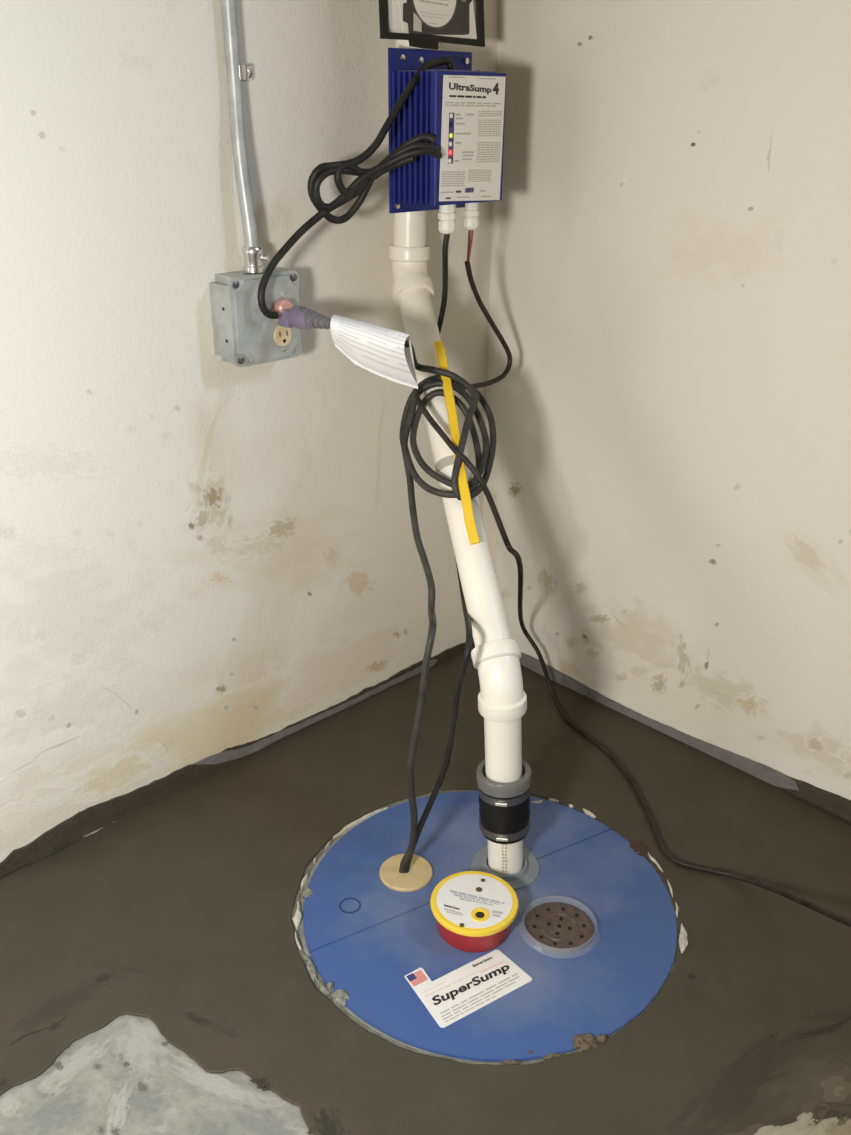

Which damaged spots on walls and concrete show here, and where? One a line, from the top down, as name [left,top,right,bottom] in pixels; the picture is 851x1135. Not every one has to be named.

water stain [0,502,456,863]
water stain [500,561,851,783]
water stain [766,517,851,606]
spalling [96,1126,121,1135]